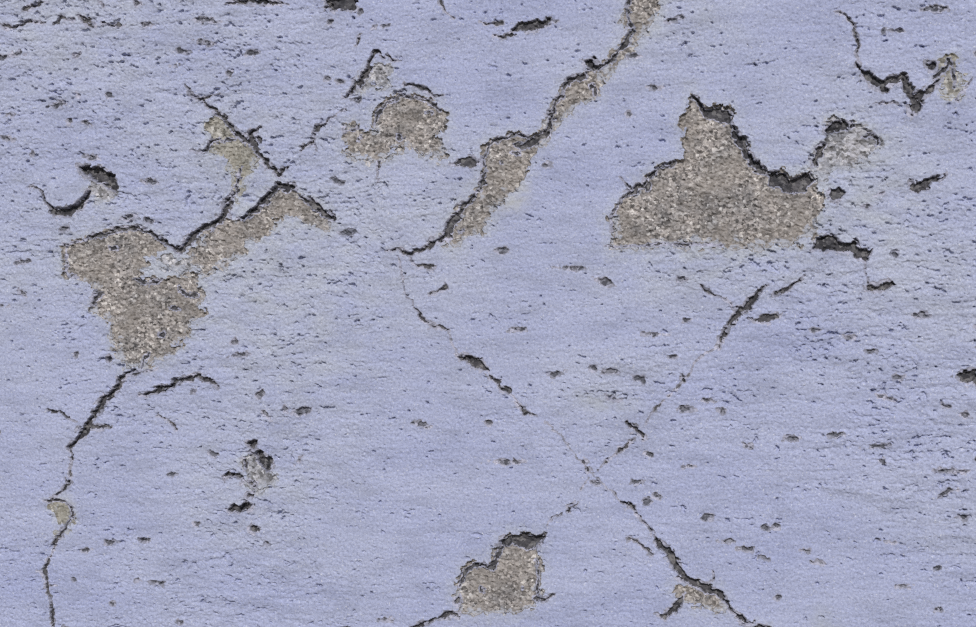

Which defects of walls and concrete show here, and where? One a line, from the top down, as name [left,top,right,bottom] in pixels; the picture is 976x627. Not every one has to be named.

flaking render [58,116,358,371]
crack [149,33,445,257]
flaking render [341,89,481,191]
spalling [478,15,560,41]
crack [384,0,806,627]
spalling [645,84,665,92]
flaking render [603,93,897,294]
crack [833,10,973,120]
crack [35,351,220,627]
flaking render [409,501,579,627]